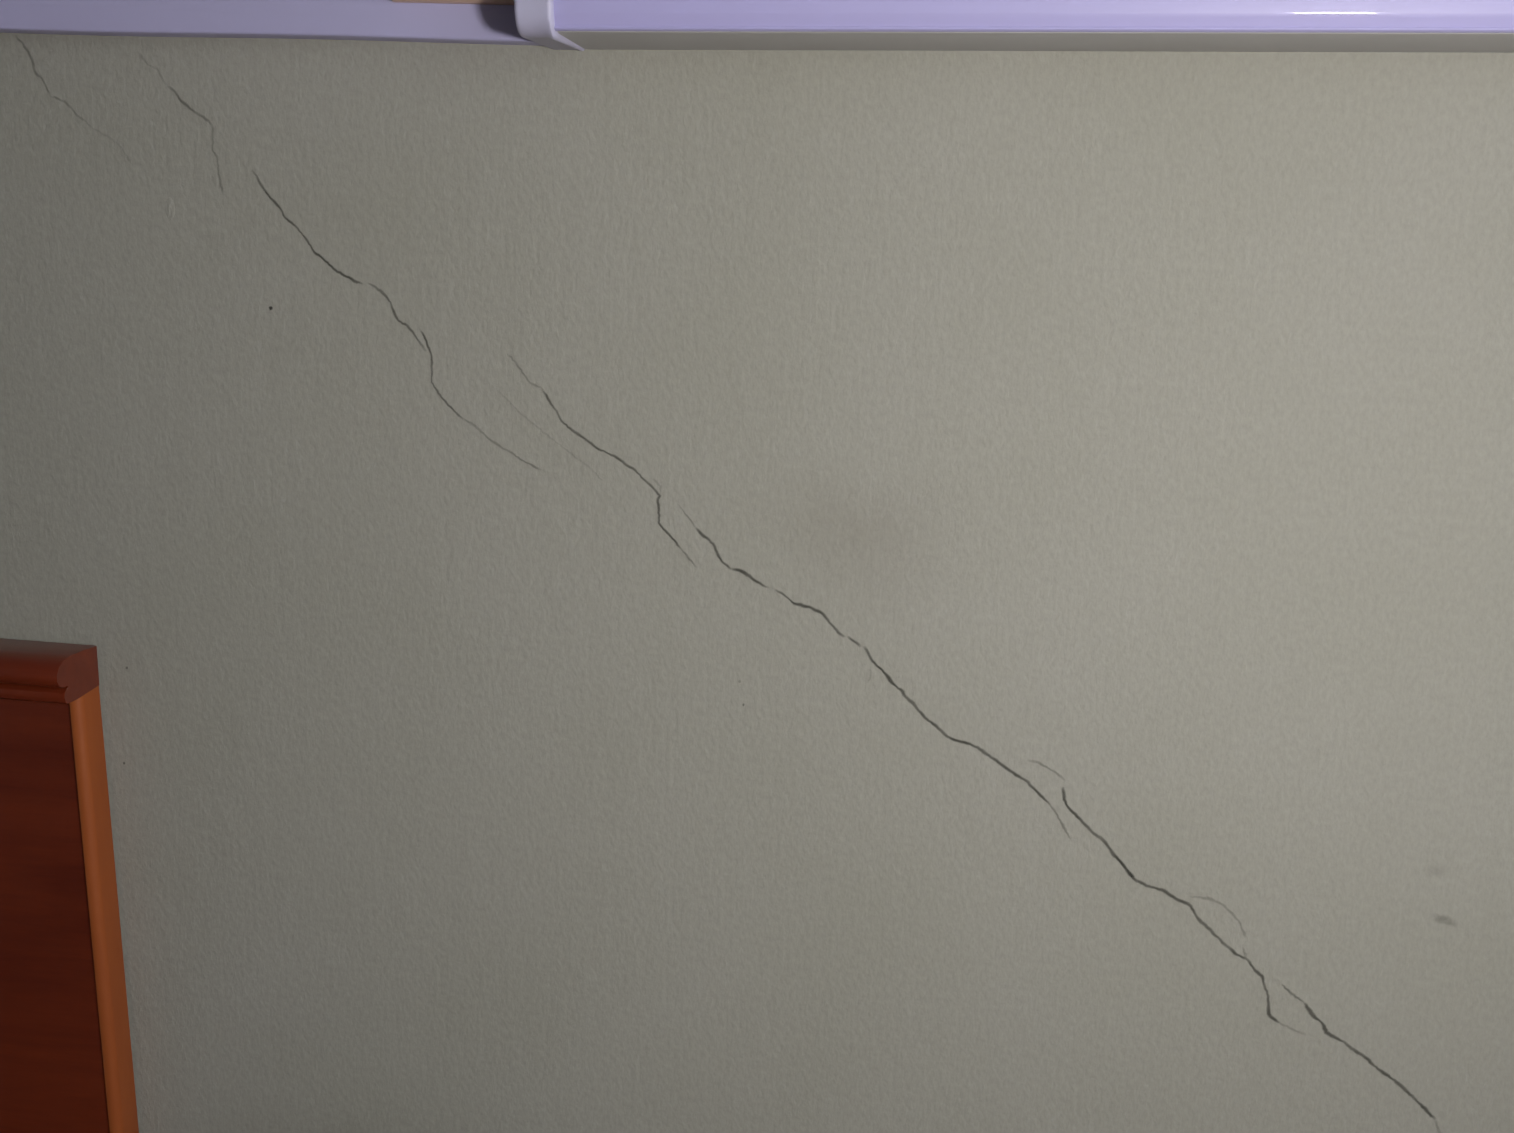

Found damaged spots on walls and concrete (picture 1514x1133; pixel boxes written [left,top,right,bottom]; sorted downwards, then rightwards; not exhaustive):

crack [1005,767,1081,820]